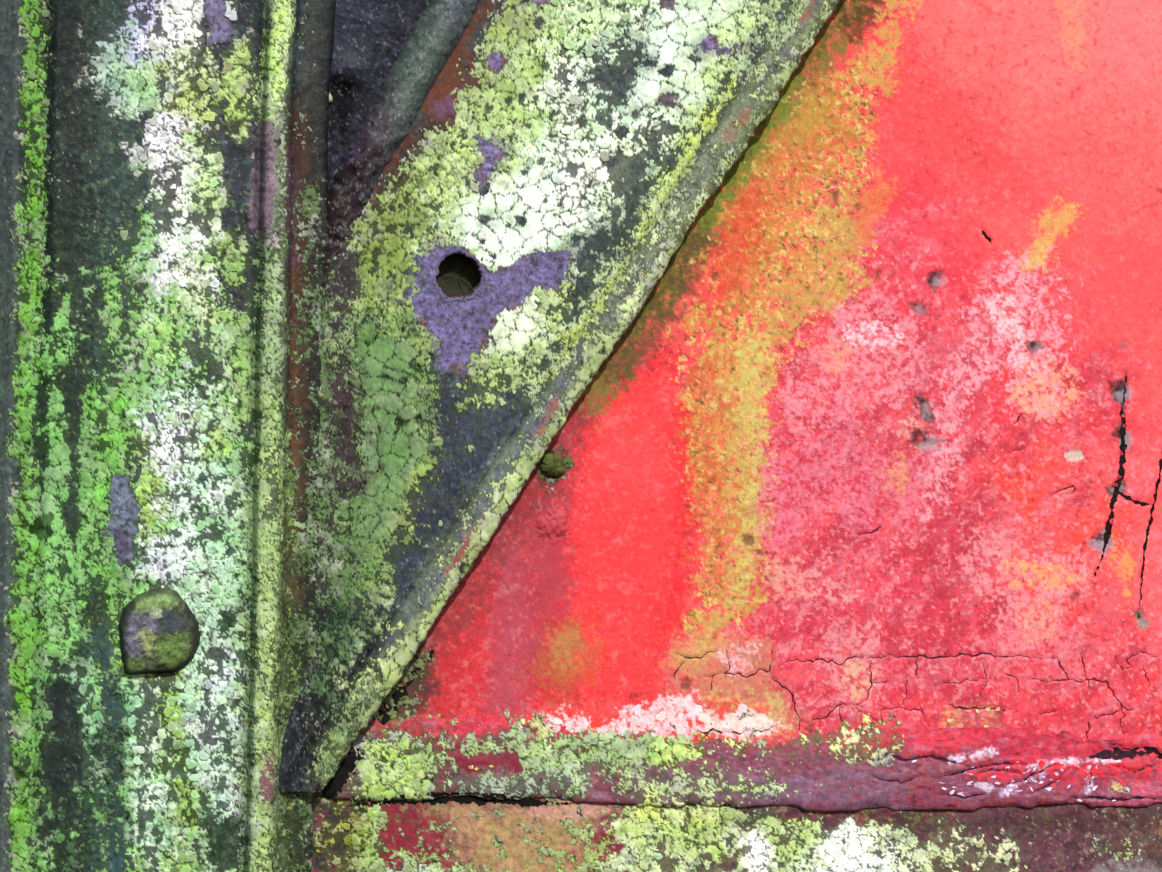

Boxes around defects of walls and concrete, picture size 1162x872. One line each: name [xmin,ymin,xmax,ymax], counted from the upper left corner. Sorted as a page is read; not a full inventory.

crack [1094,374,1162,619]
crack [674,650,1162,802]
peeling [939,744,1162,802]